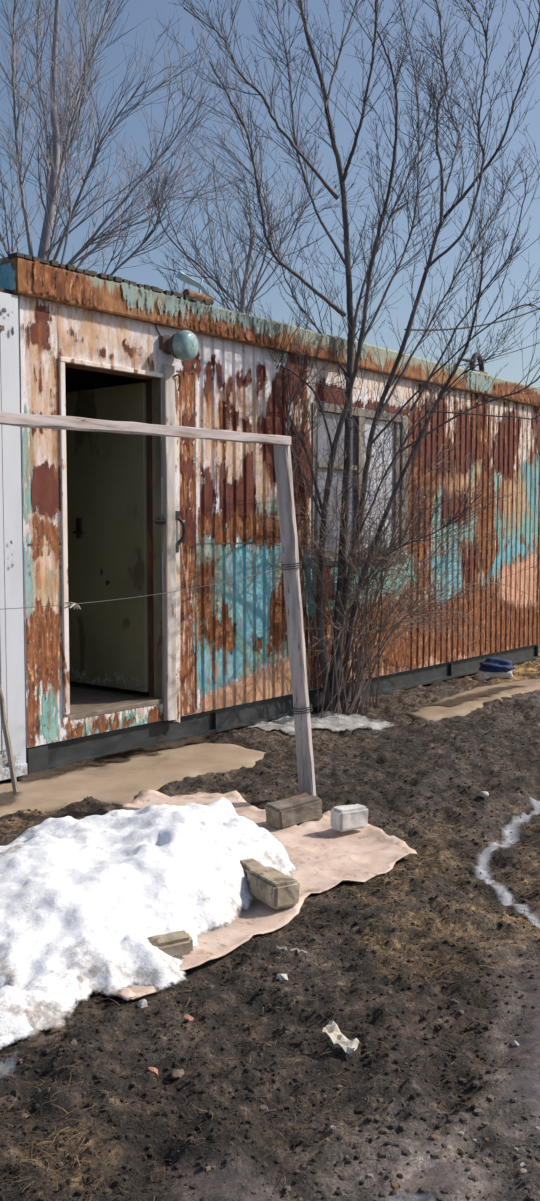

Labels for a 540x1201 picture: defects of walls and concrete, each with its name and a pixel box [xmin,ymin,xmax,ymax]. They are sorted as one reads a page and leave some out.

peeling [0,262,16,290]
peeling [1,299,54,393]
peeling [67,327,155,372]
corrosion [26,260,312,466]
peeling [122,282,288,338]
peeling [10,404,62,620]
corrosion [26,511,164,747]
corrosion [176,369,292,716]
peeling [180,337,540,713]
corrosion [293,381,540,690]